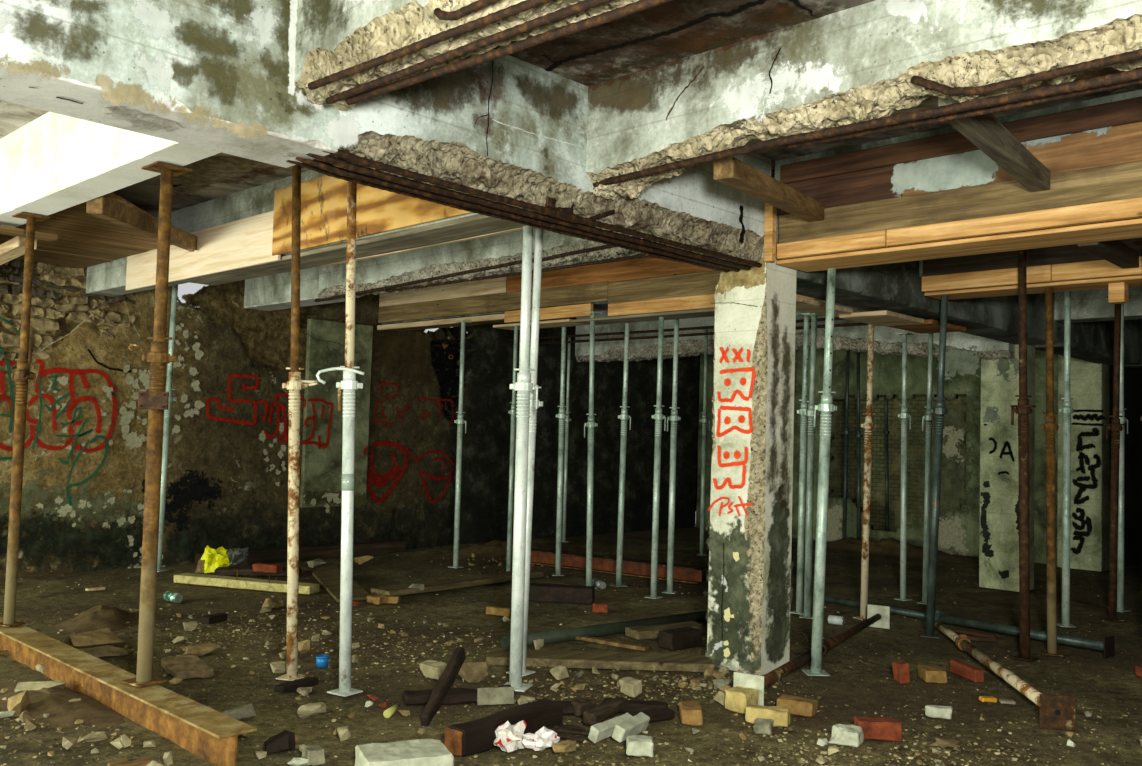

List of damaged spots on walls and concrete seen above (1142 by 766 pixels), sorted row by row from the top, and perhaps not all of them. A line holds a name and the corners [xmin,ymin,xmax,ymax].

water stain [12,0,105,59]
water stain [172,0,256,104]
water stain [261,0,348,115]
water stain [324,110,360,148]
crack [543,0,818,72]
crack [666,66,704,121]
crack [769,48,781,94]
water stain [987,0,1088,34]
flaking render [0,259,136,377]
spalling [173,0,1142,672]
peeling [172,323,205,434]